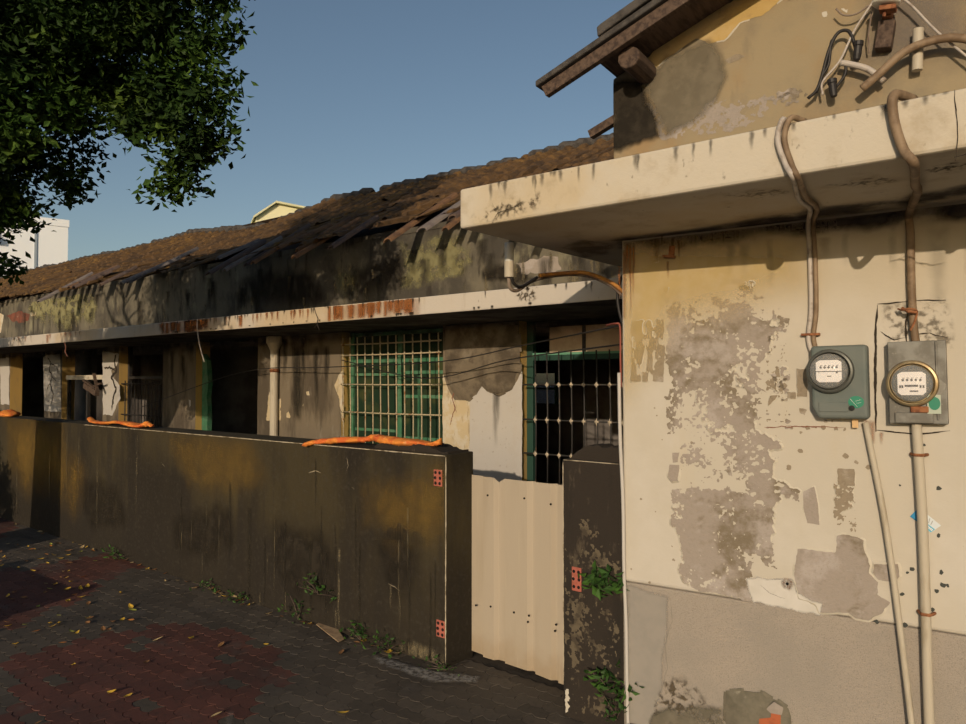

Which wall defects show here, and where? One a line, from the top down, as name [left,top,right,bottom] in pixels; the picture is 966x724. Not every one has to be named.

peeling [646,87,808,140]
damp [486,197,538,219]
damp [480,241,535,304]
rust [328,298,413,321]
crack [46,342,68,405]
crack [104,355,117,408]
damp [18,432,62,478]
peeling [629,279,846,602]
peeling [792,453,915,624]
peeling [562,460,632,718]
damp [409,645,437,663]
spalling [723,688,791,724]